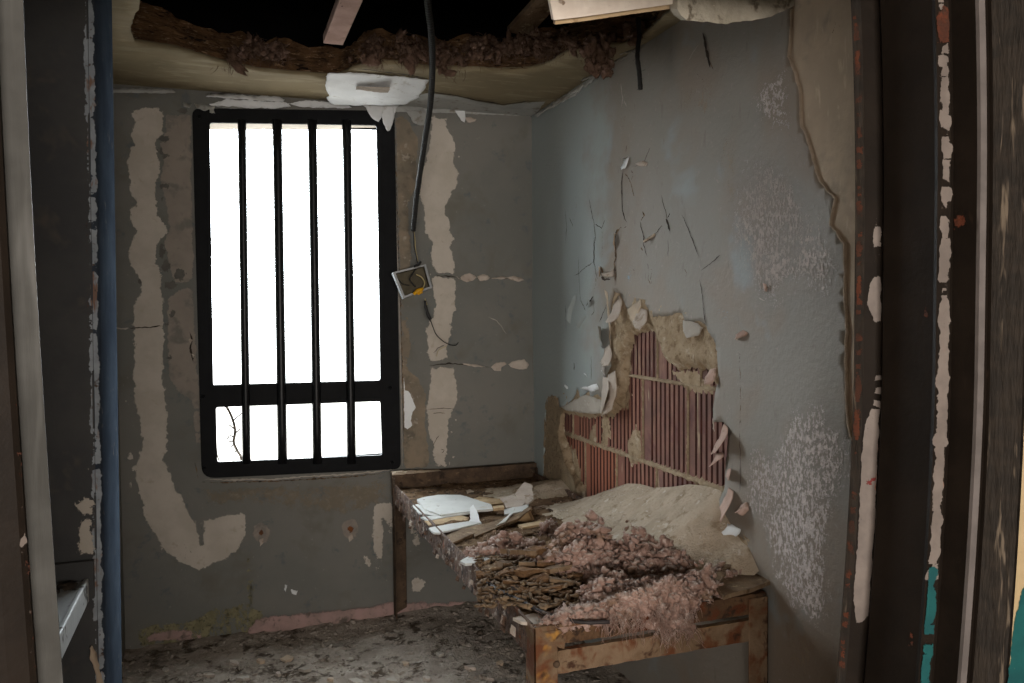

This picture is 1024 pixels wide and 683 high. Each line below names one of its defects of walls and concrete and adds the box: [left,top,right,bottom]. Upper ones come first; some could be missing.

rust [936,5,950,43]
peeling [125,1,669,571]
peeling [411,577,426,592]
crack [565,200,607,322]
flaking render [543,290,750,546]
crack [640,199,719,323]
efflorescence [737,401,851,629]
flaking render [787,0,882,623]
peeling [908,43,953,683]